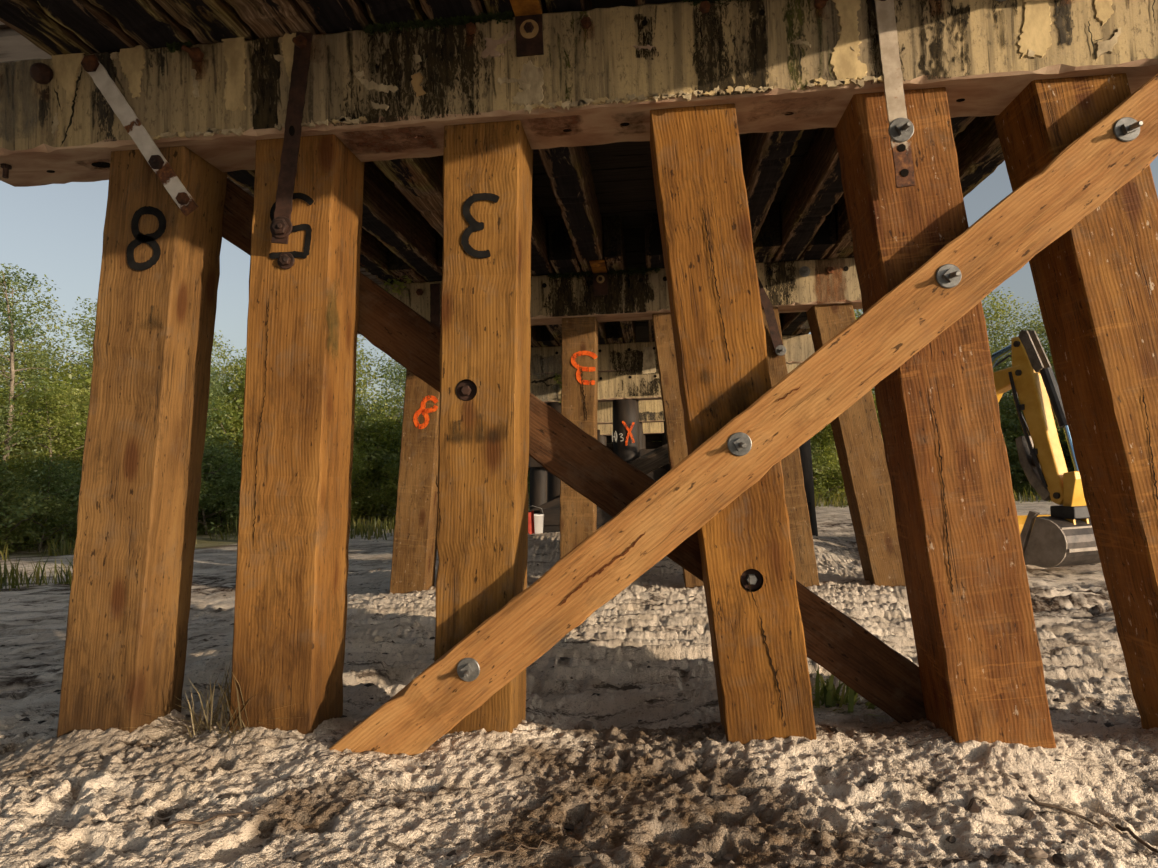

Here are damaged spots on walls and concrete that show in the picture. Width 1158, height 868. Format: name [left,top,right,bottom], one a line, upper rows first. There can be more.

peeling [51,53,84,105]
peeling [110,45,146,98]
peeling [301,55,426,128]
damp [327,20,496,126]
damp [634,5,659,60]
damp [692,0,771,98]
damp [782,0,832,91]
peeling [806,0,884,89]
peeling [1016,0,1052,59]
crack [1142,387,1158,500]
crack [932,406,953,594]
crack [748,574,783,721]